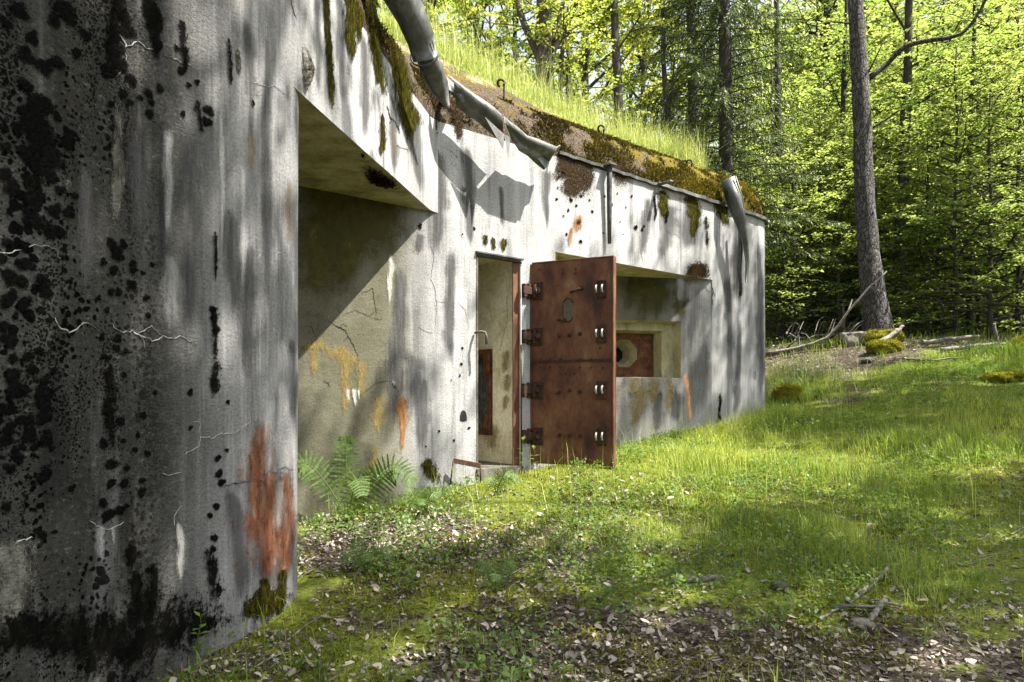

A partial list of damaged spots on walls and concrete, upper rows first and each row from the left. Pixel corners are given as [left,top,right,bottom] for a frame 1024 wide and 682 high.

damp [106,0,127,74]
crack [117,27,198,75]
damp [79,169,92,286]
damp [183,141,197,318]
rust [568,215,582,245]
crack [55,317,195,347]
crack [304,291,383,351]
crack [163,391,258,476]
rust [396,396,410,452]
rust [627,375,691,427]
rust [238,421,297,586]
efflorescence [0,539,35,631]